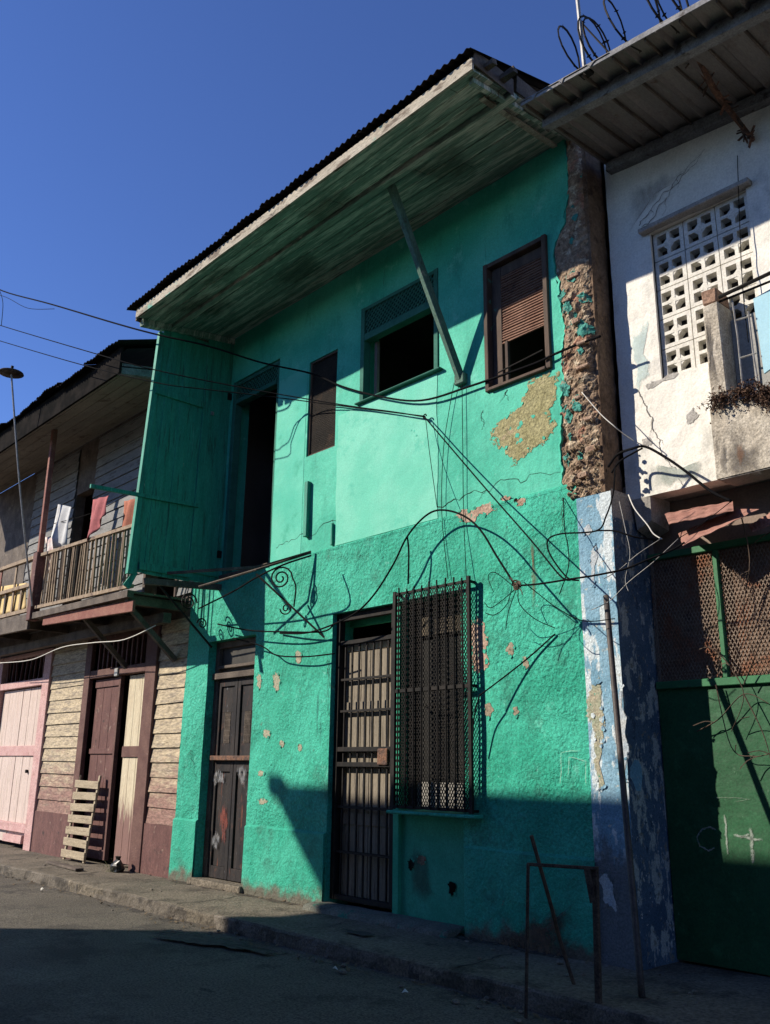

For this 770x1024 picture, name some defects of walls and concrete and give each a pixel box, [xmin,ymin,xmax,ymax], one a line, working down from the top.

flaking render [490,140,623,500]
peeling [456,495,526,523]
flaking render [505,642,529,669]
peeling [256,672,281,693]
flaking render [483,703,494,720]
peeling [262,729,302,751]
peeling [586,679,629,792]
peeling [599,871,618,912]